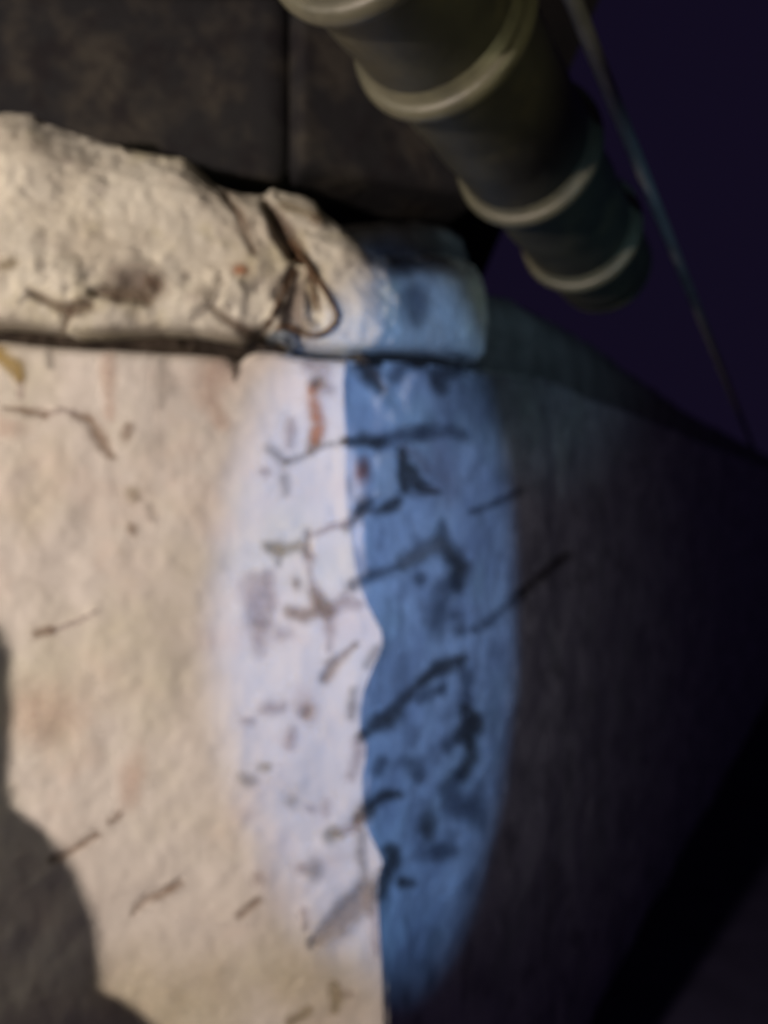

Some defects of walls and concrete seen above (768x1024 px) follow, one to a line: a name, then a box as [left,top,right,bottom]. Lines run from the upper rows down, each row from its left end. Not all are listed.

crack [224,193,256,253]
crack [0,292,463,380]
crack [8,408,47,417]
crack [75,415,112,457]
rust [308,385,323,453]
crack [342,427,468,448]
crack [329,498,402,529]
crack [266,544,308,555]
crack [472,553,569,632]
crack [357,655,470,740]
crack [355,790,402,822]
crack [316,881,383,944]